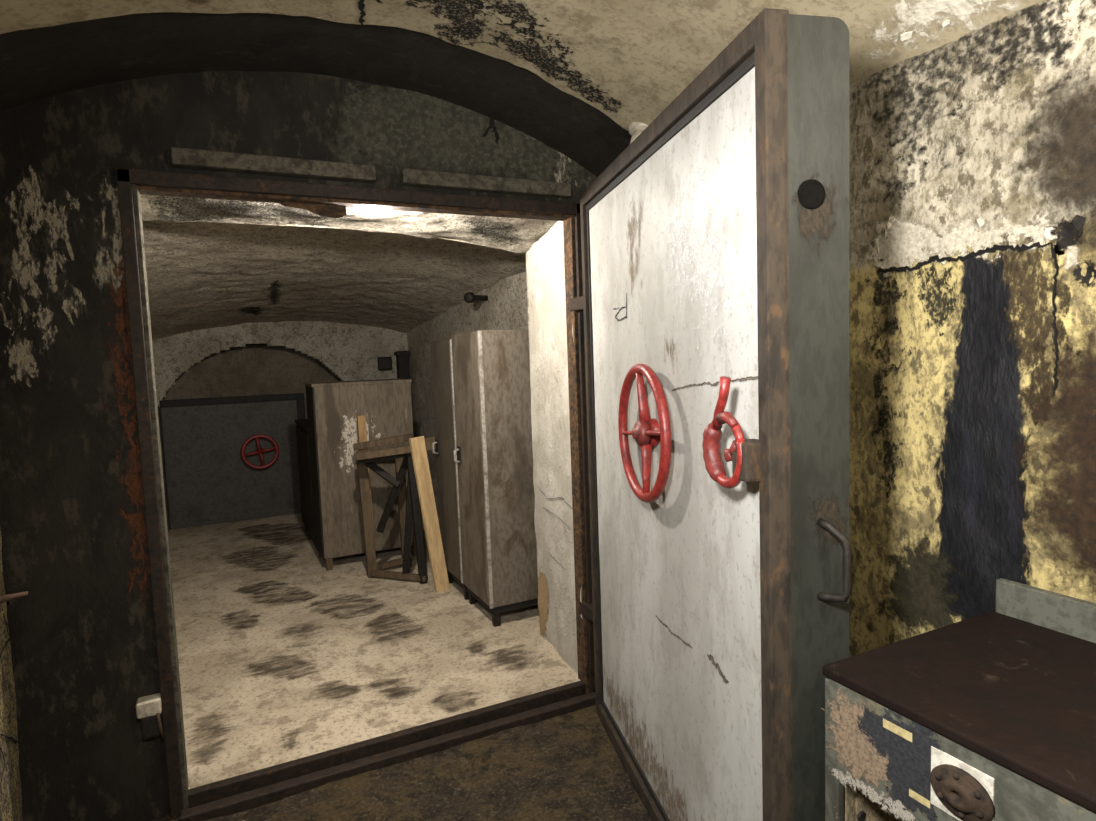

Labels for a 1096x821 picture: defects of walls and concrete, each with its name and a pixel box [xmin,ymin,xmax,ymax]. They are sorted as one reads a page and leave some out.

crack [358,0,382,25]
water stain [404,0,621,116]
water stain [851,0,1096,209]
water stain [0,167,89,387]
water stain [94,186,124,292]
water stain [865,259,970,502]
crack [878,241,1059,395]
peeling [869,209,1096,287]
water stain [993,75,1096,593]